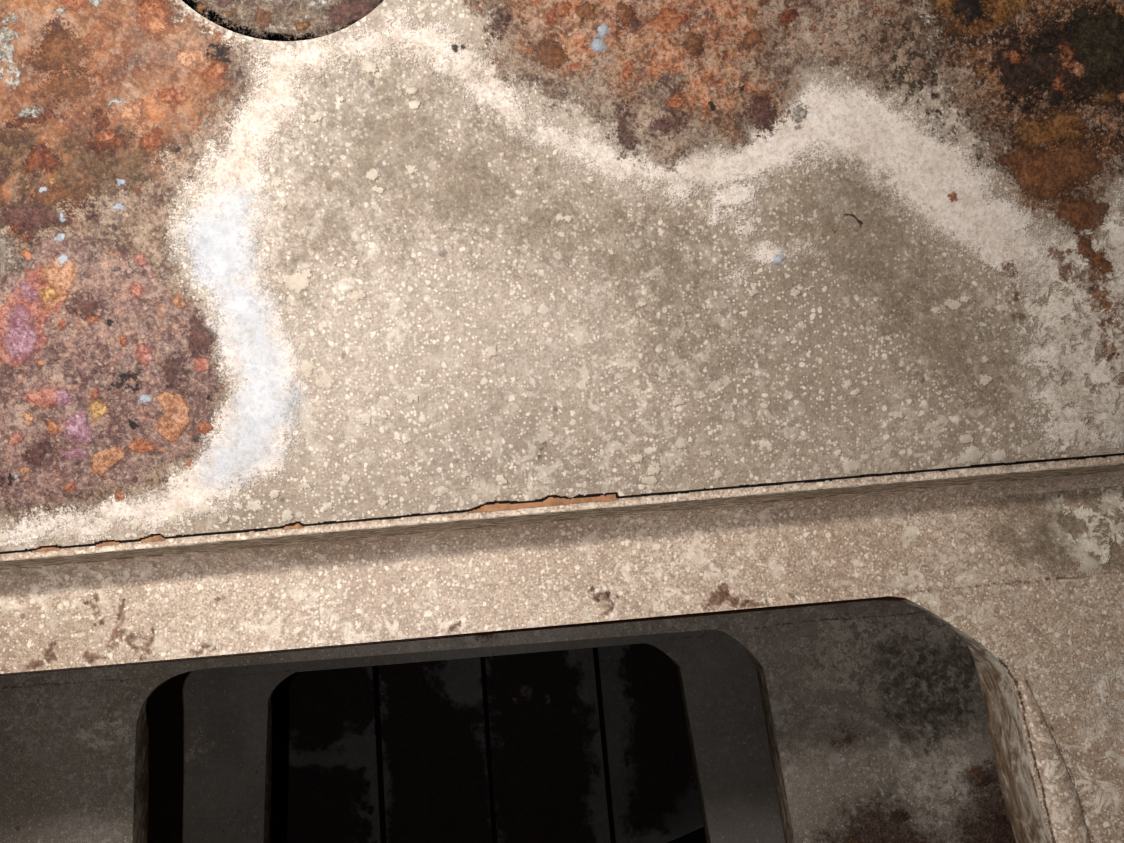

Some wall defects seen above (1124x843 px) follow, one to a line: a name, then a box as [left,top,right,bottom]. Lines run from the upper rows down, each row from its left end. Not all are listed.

rust [0,0,384,528]
leakage [0,10,1124,547]
rust [451,0,1124,387]
spalling [467,492,619,513]
leakage [778,601,991,837]